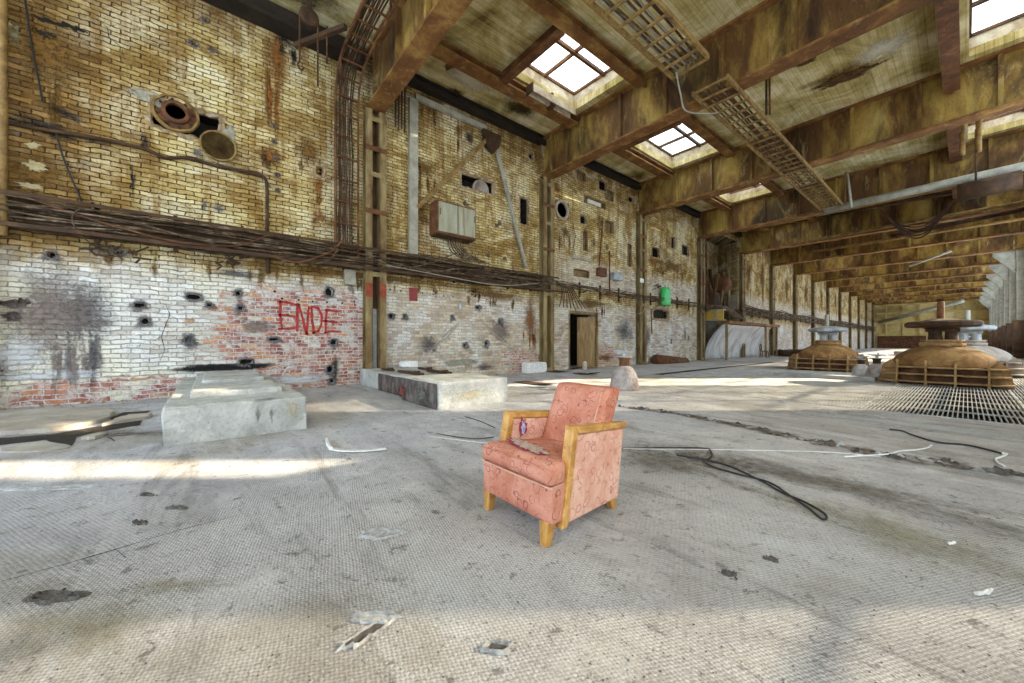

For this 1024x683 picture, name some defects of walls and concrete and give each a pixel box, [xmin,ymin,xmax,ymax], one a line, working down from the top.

rust [265,34,286,128]
rust [259,147,281,167]
leakage [0,267,111,385]
rust [523,303,536,349]
spalling [334,610,403,653]
spalling [479,639,519,656]